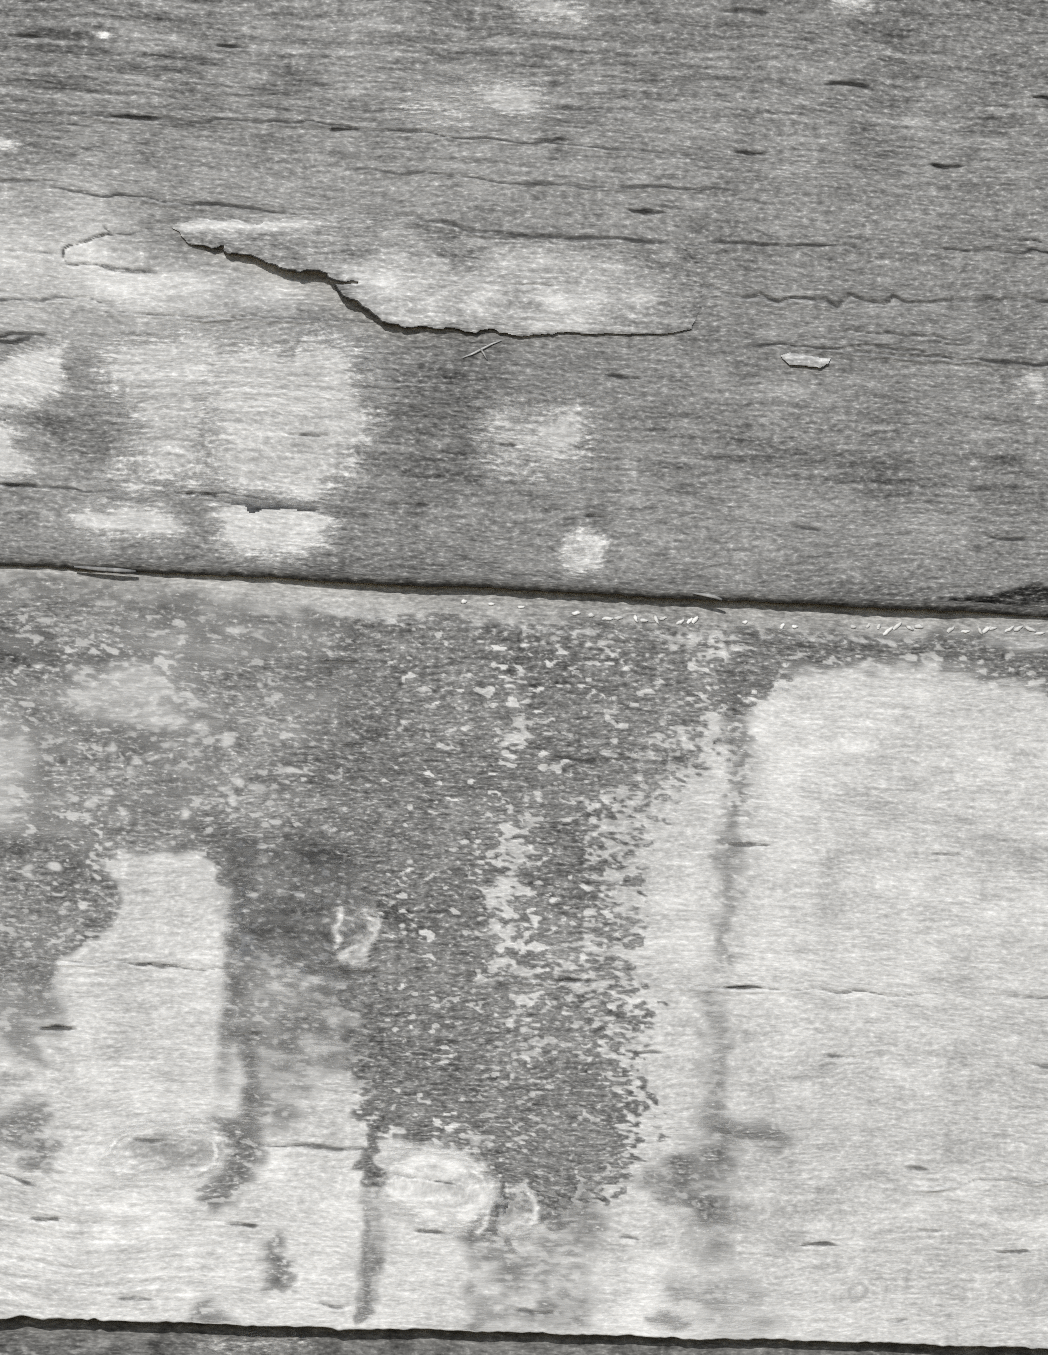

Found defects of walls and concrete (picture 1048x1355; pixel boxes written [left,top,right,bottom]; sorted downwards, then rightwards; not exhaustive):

peeling [172,213,707,337]
peeling [781,352,831,368]
crack [741,294,1048,366]
leakage [0,572,1048,1330]